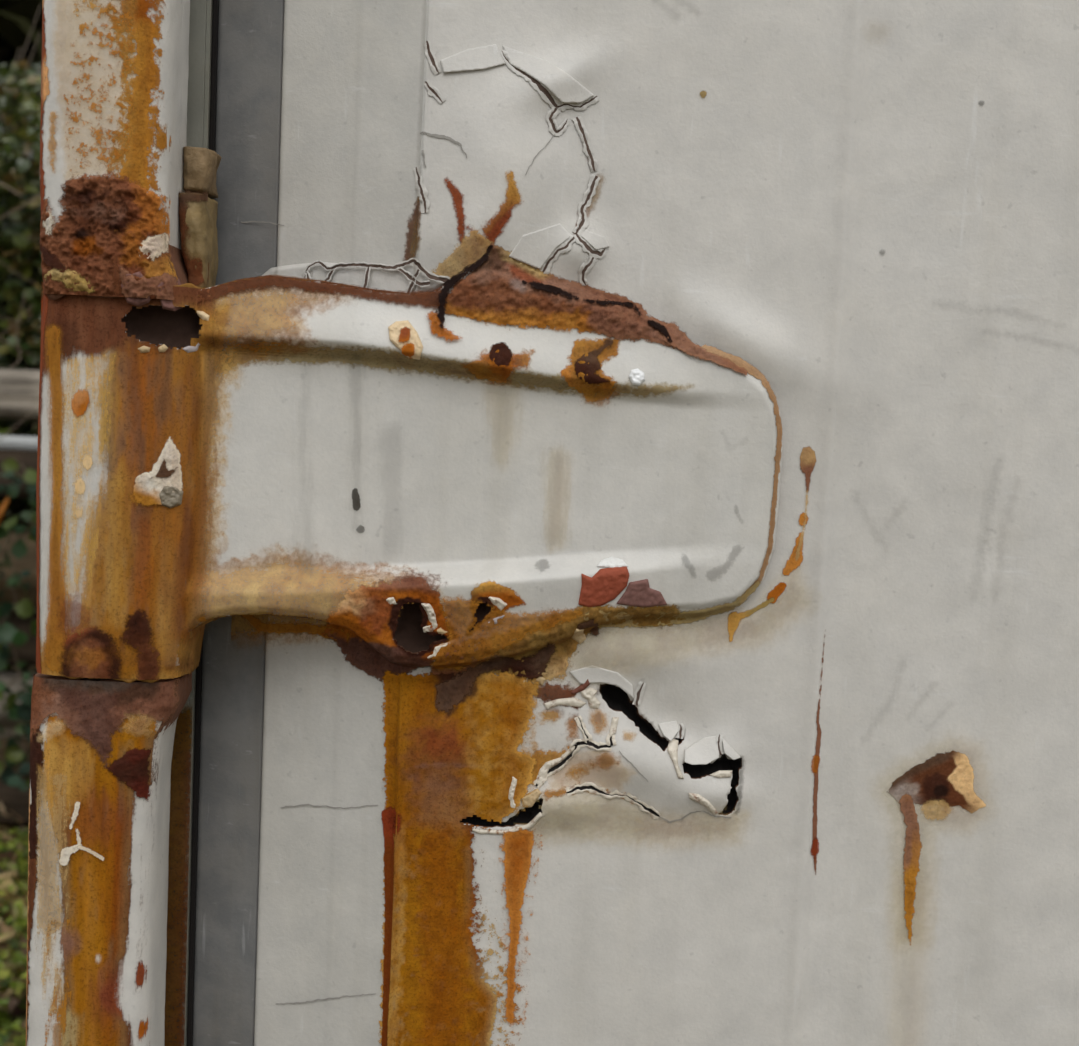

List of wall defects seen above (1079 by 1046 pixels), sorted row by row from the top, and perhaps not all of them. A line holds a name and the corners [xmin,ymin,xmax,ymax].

crack [422,41,446,104]
crack [413,132,467,213]
crack [499,50,607,286]
crack [303,258,450,293]
spalling [121,305,203,349]
peeling [132,437,183,506]
rust [26,0,816,1046]
peeling [537,746,575,785]
spalling [570,665,741,814]
spalling [460,798,543,826]